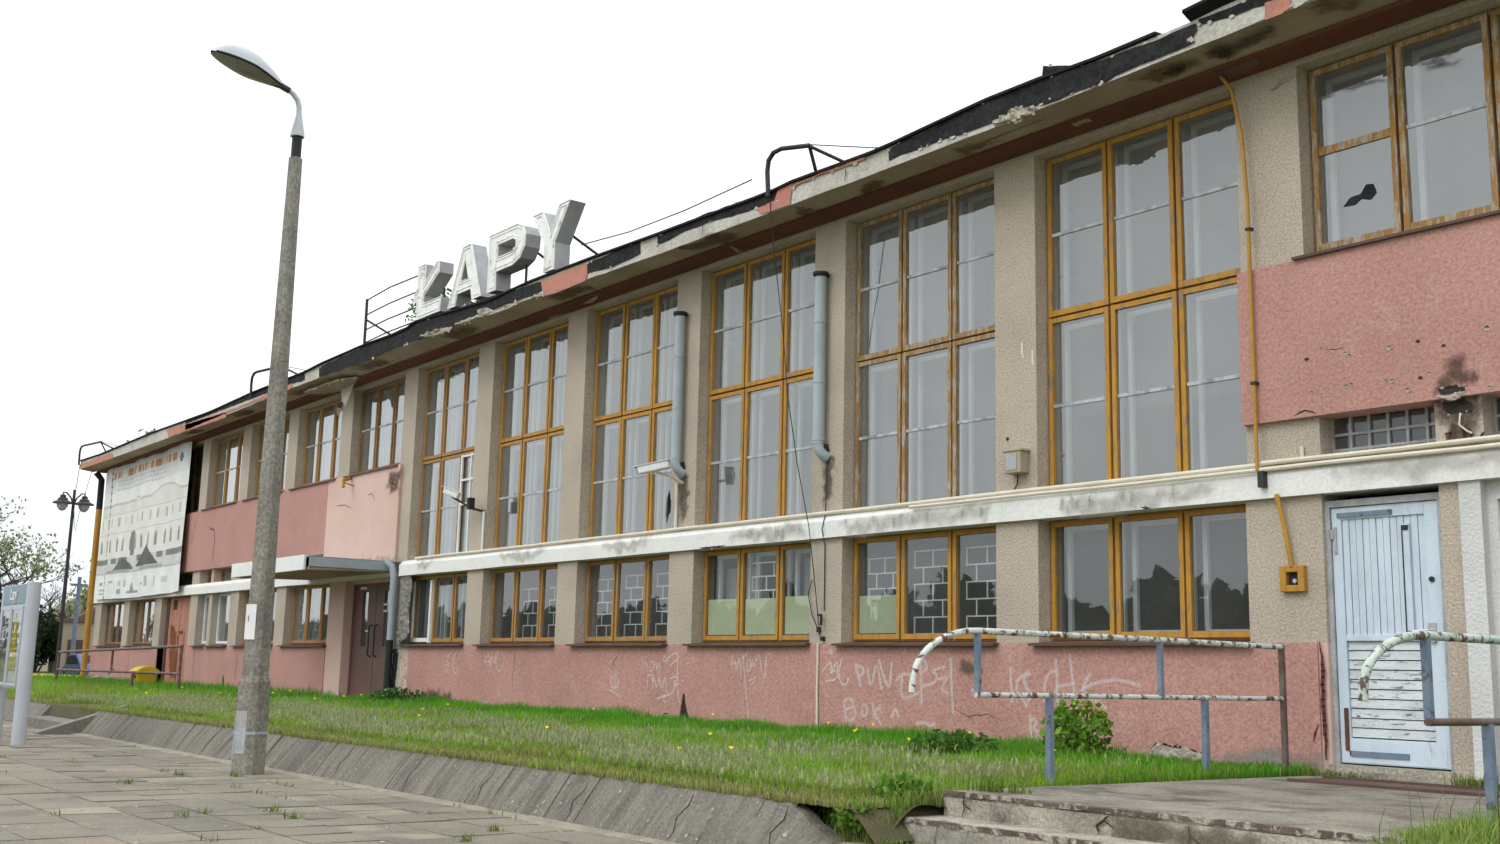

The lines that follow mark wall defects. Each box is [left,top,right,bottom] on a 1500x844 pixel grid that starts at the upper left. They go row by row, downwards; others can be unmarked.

peeling [886,0,1272,161]
water stain [1129,27,1274,82]
peeling [587,157,865,273]